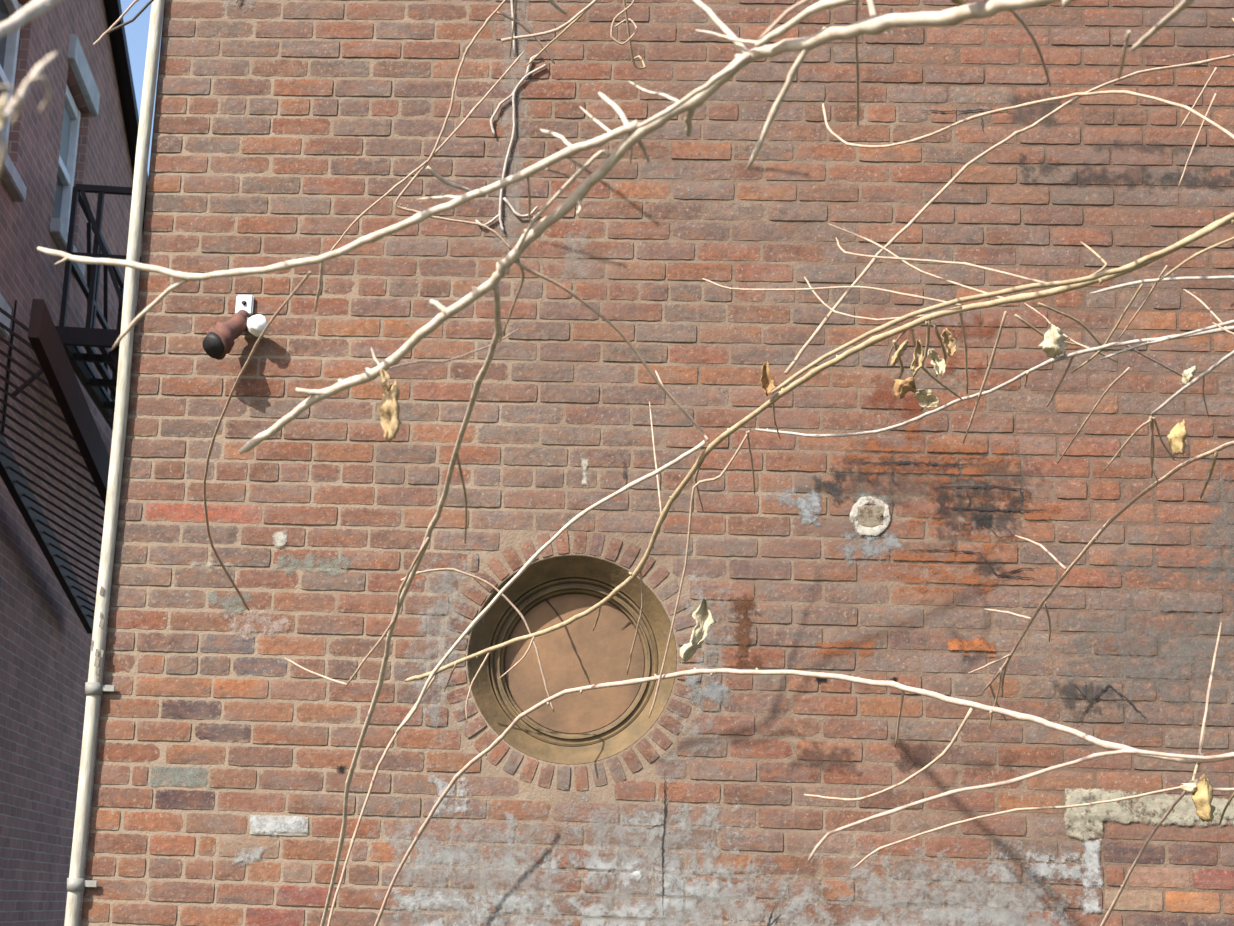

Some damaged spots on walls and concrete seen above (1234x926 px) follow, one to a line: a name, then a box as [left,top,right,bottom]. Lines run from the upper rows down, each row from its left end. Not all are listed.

water stain [1073,166,1234,192]
rust [733,596,760,658]
spalling [813,639,875,656]
spalling [948,638,997,657]
water stain [430,775,467,812]
crack [646,772,666,905]
water stain [616,806,719,836]
water stain [487,853,560,873]
water stain [569,833,831,926]
water stain [850,840,1103,926]
water stain [395,890,557,926]